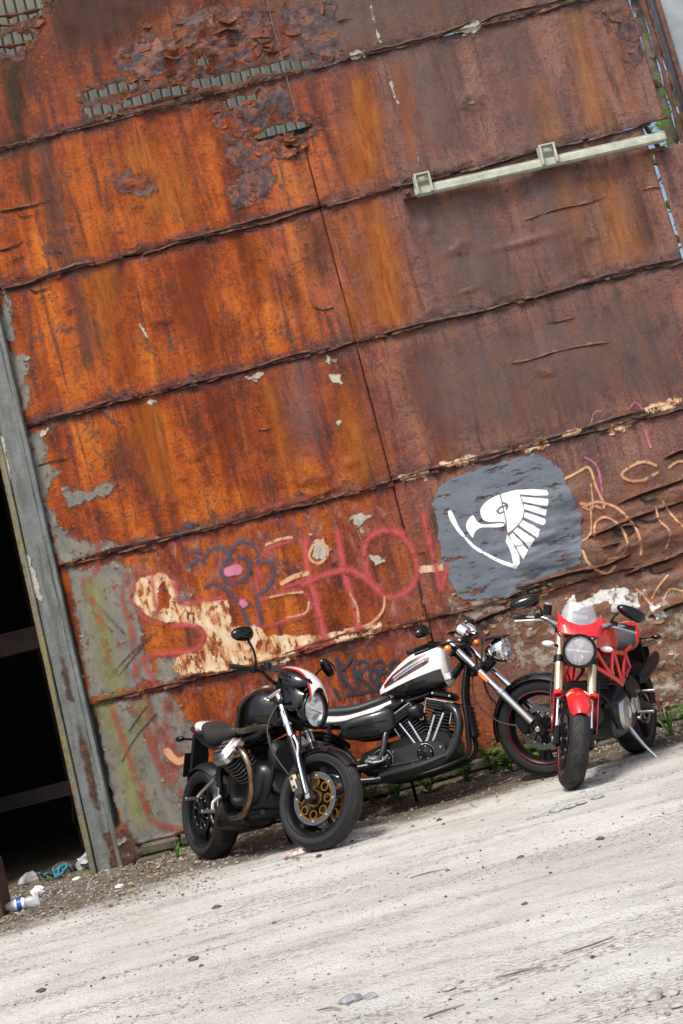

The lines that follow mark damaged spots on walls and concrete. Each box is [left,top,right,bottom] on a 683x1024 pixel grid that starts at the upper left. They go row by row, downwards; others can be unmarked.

rust [0,0,53,61]
rust [593,5,645,68]
rust [77,0,353,211]
crack [523,196,607,221]
crack [510,341,609,364]
peeling [608,421,633,435]
peeling [644,398,682,413]
peeling [29,428,555,868]
peeling [565,579,683,707]